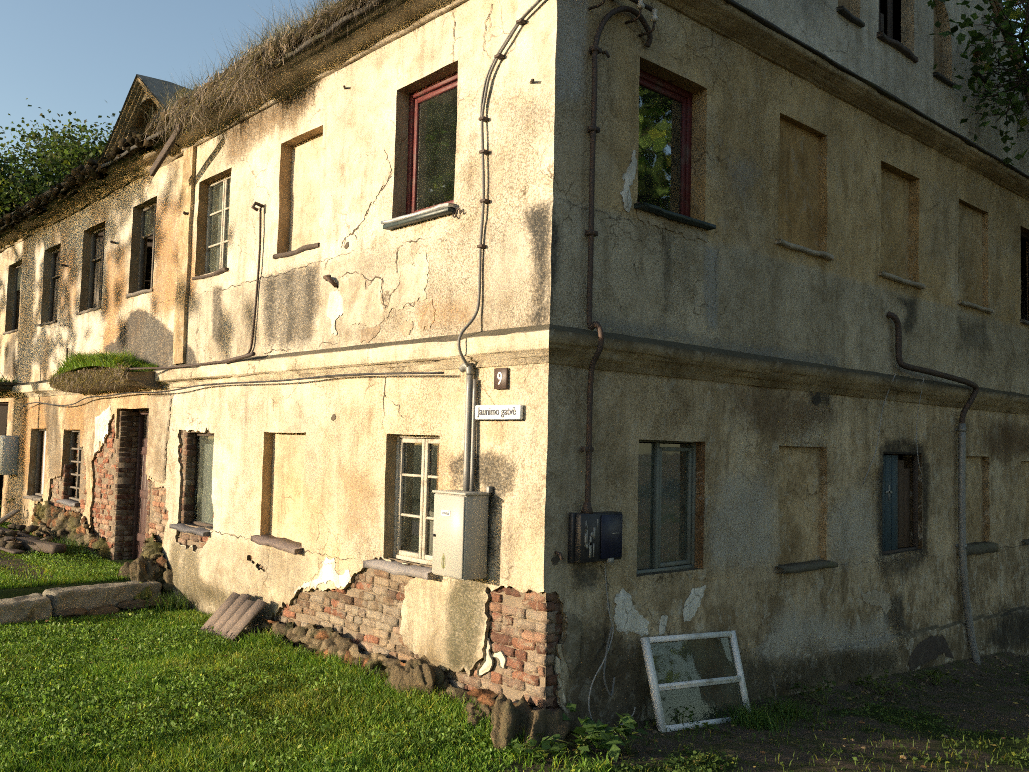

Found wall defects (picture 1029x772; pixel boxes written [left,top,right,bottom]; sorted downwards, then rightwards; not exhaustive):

crack [159,176,431,307]
peeling [327,252,436,343]
damp [525,203,558,324]
peeling [619,150,709,242]
spalling [50,405,121,557]
peeling [145,393,214,553]
spalling [273,557,432,663]
spalling [445,586,566,711]
peeling [613,588,668,636]
peeling [683,585,706,622]
damp [690,655,892,706]